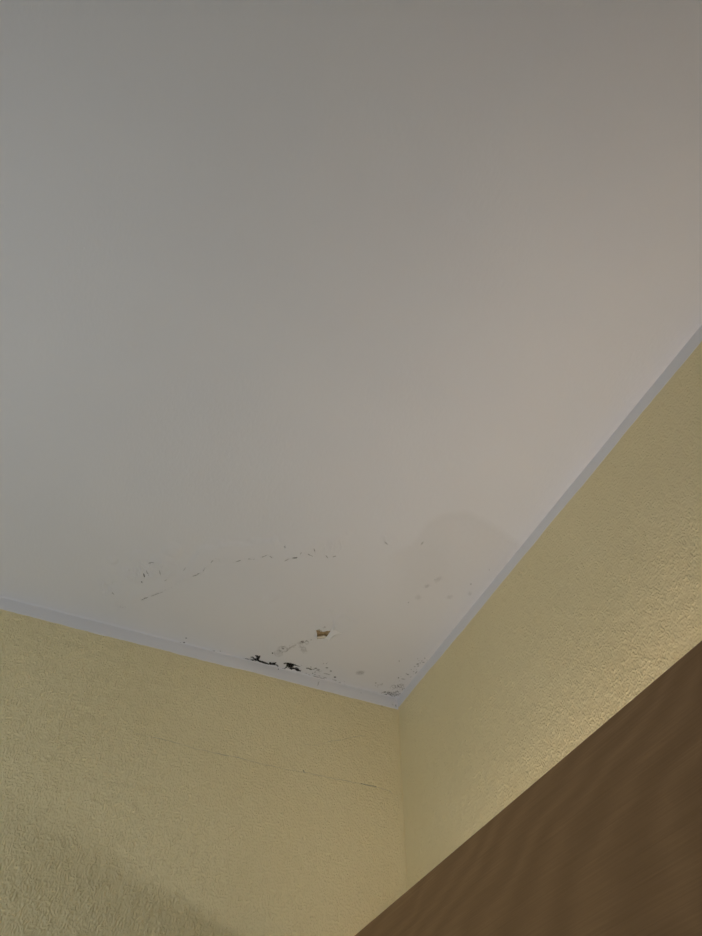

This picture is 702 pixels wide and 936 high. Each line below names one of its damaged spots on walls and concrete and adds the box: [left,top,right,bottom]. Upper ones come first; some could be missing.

mould [245,653,336,679]